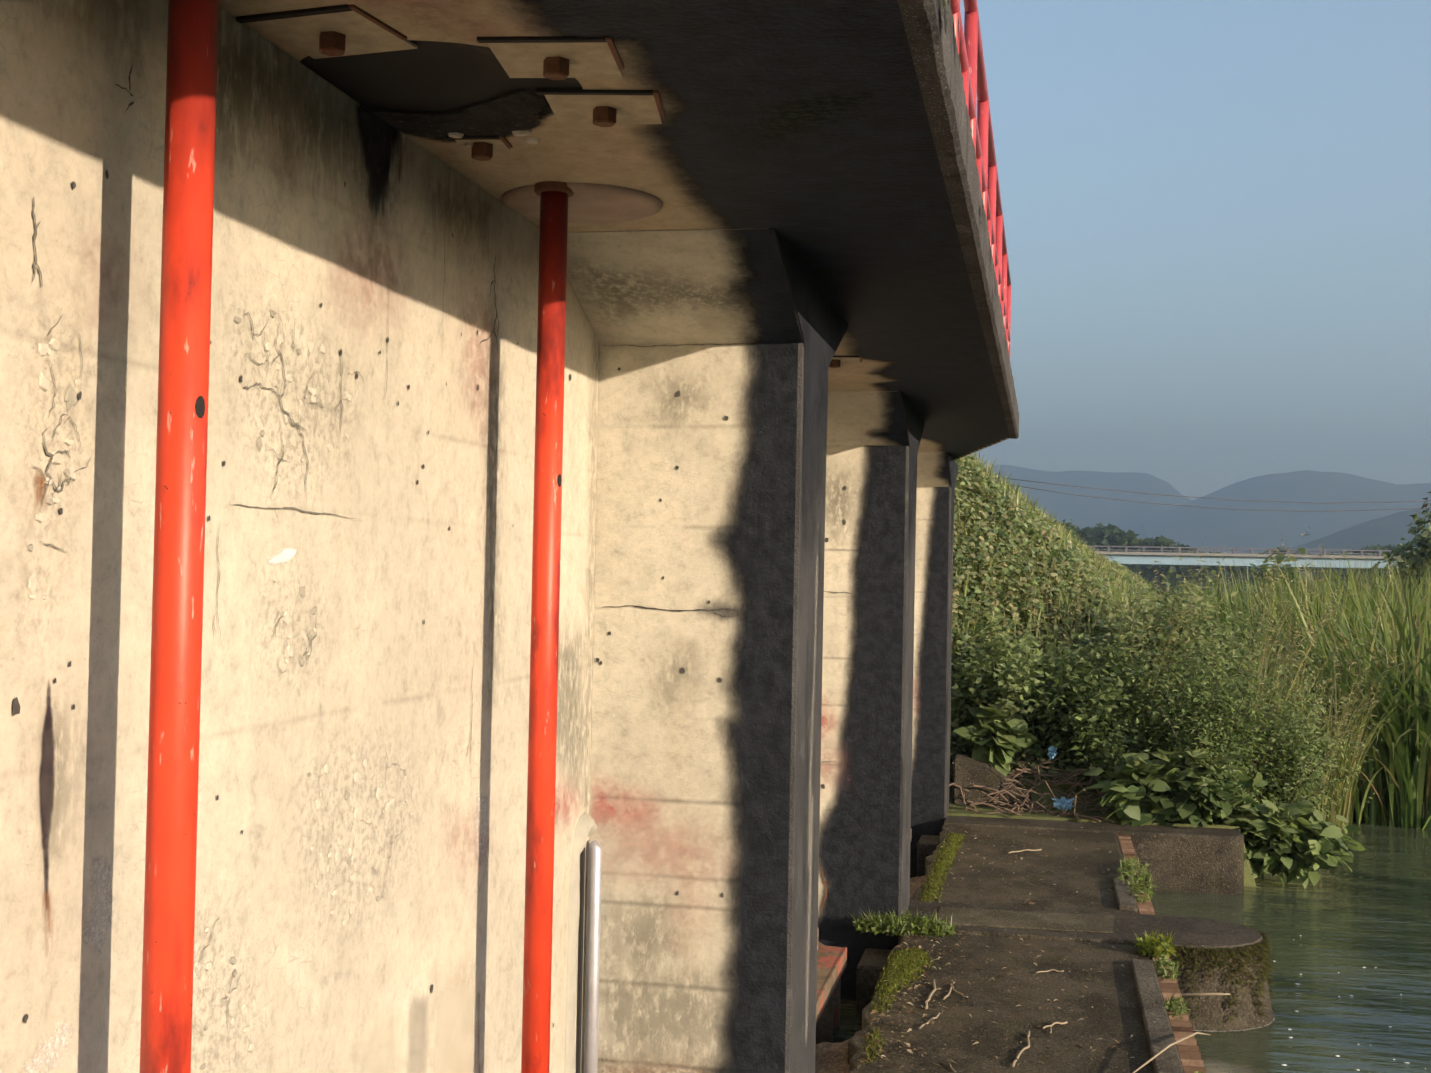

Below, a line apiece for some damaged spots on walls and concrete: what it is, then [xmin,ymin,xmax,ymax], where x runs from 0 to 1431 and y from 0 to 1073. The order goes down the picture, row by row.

water stain [357,104,400,210]
crack [43,427,76,492]
crack [213,310,357,635]
water stain [512,0,1010,1073]
crack [606,605,738,617]
water stain [475,797,488,860]